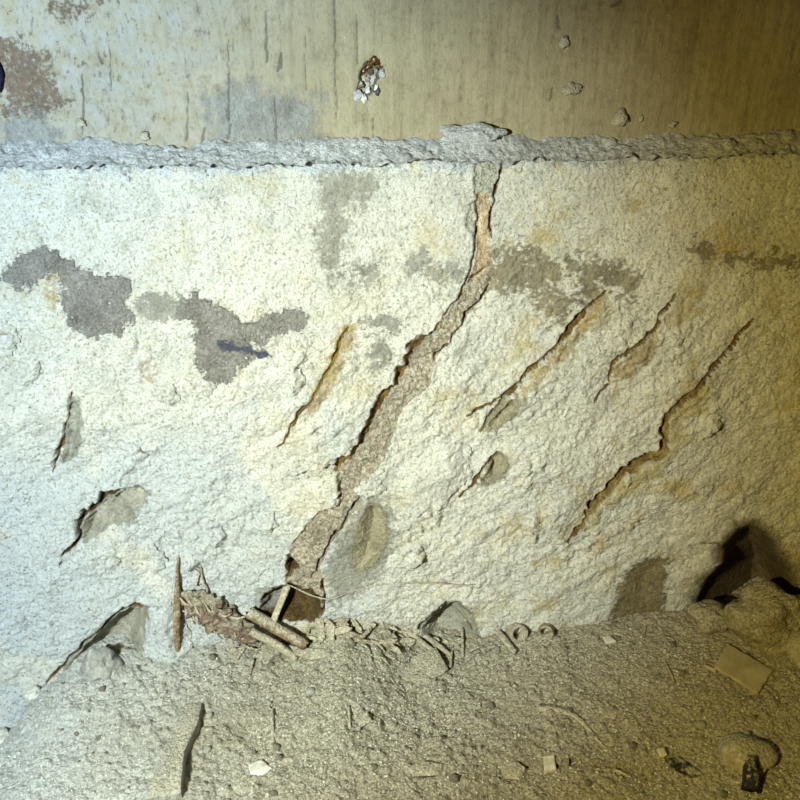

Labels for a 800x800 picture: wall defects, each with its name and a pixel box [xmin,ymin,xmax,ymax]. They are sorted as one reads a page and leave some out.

water stain [0,35,72,144]
water stain [480,234,644,331]
spalling [52,391,83,472]
crack [255,162,502,622]
spalling [458,451,509,498]
crack [466,290,606,432]
crack [594,293,677,403]
crack [567,317,754,544]
spalling [59,485,149,566]
spalling [691,520,800,603]
spalling [46,635,93,683]